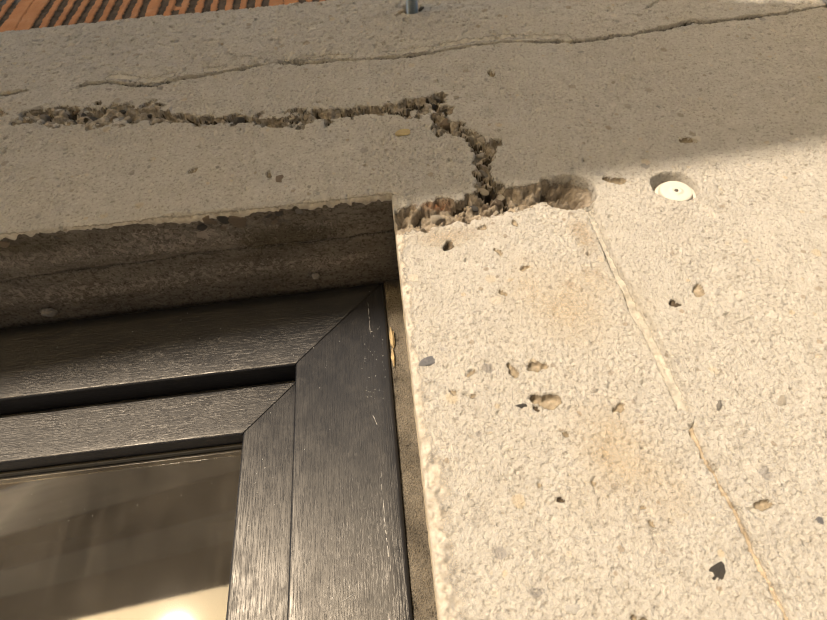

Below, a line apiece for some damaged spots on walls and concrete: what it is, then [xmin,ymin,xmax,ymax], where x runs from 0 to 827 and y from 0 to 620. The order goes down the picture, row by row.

crack [105,72,185,87]
crack [381,34,611,60]
spalling [0,91,594,620]
crack [585,211,788,620]